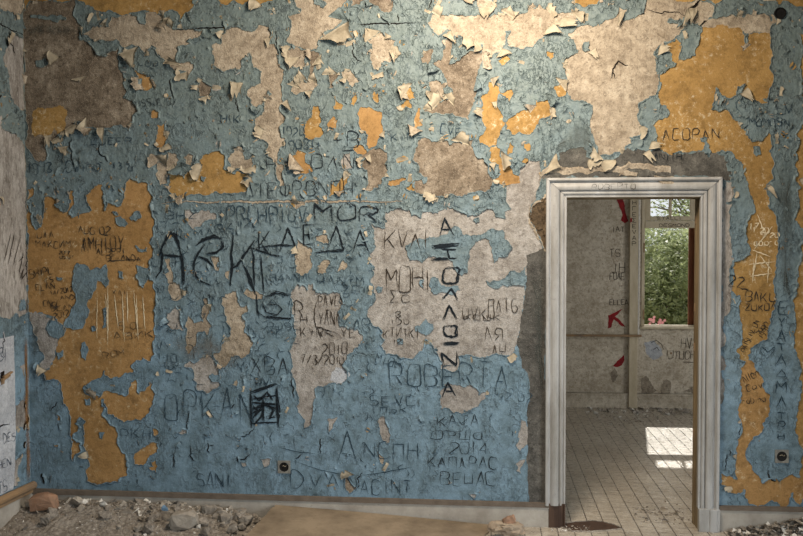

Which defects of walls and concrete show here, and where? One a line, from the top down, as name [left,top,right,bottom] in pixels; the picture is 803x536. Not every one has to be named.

crack [0,23,24,55]
flaking render [191,75,225,112]
crack [610,59,628,79]
flaking render [183,205,230,233]
flaking render [178,240,265,395]
flaking render [284,282,376,429]
flaking render [720,355,729,405]
peeling [133,426,161,481]